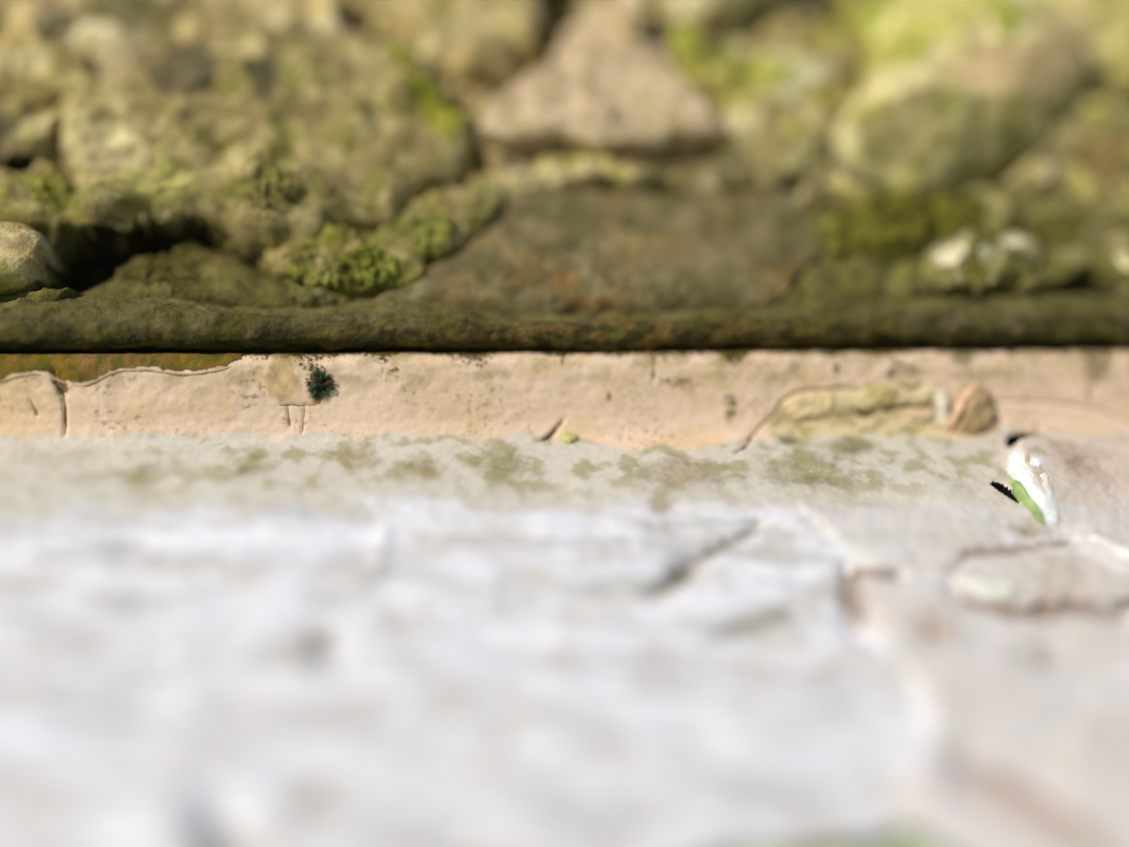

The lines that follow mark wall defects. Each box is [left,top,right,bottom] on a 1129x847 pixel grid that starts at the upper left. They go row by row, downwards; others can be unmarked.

peeling [0,352,243,387]
peeling [935,382,997,435]